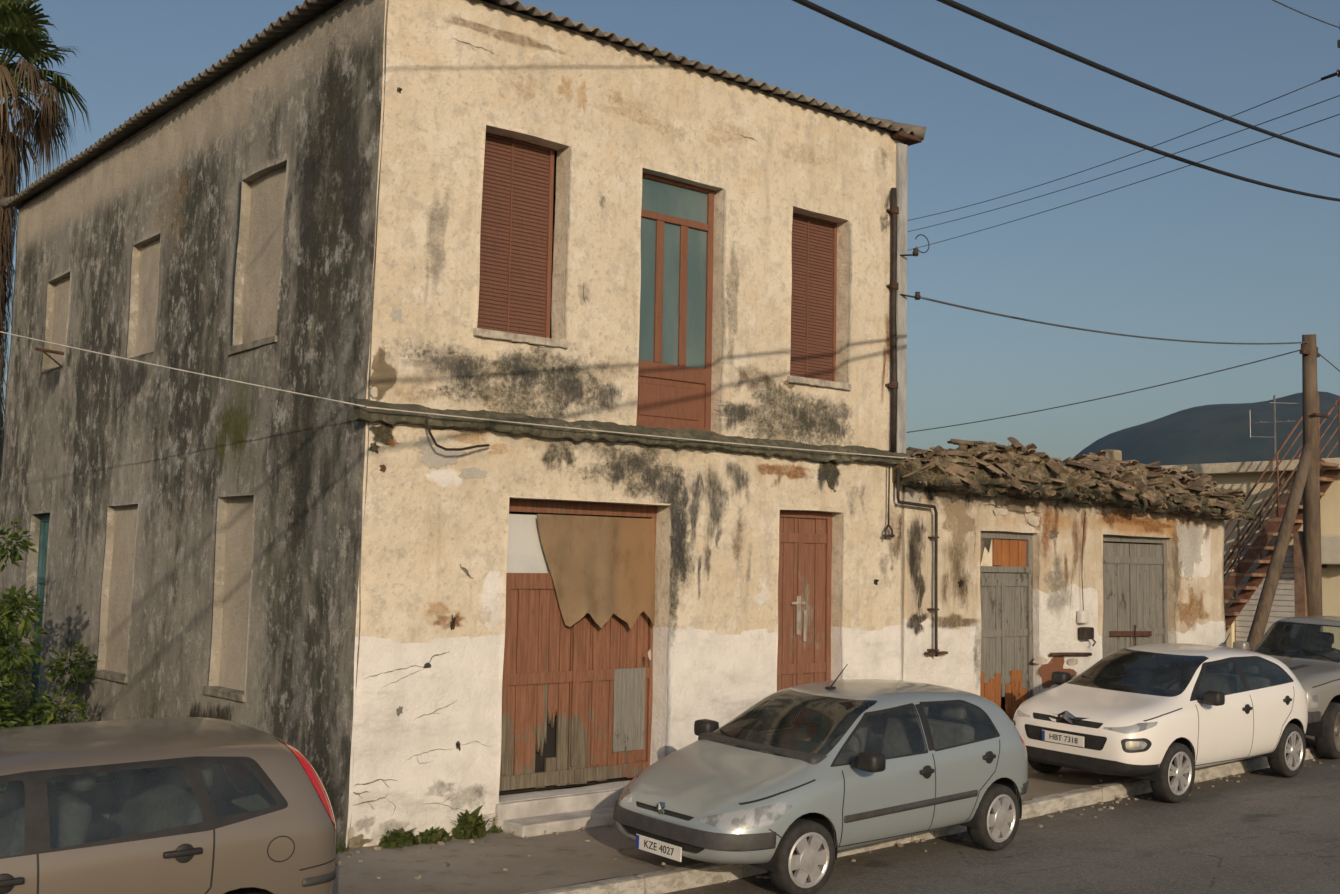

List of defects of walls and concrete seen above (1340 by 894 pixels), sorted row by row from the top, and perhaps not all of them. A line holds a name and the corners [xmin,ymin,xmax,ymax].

spalling [370,348,396,401]
leakage [415,347,622,418]
leakage [713,374,847,445]
leakage [544,442,573,468]
leakage [585,446,748,630]
leakage [818,461,840,492]
spalling [892,437,1257,580]
leakage [888,516,973,634]
crack [362,652,448,687]
leakage [190,705,231,720]
leakage [314,740,351,825]
crack [353,741,490,813]